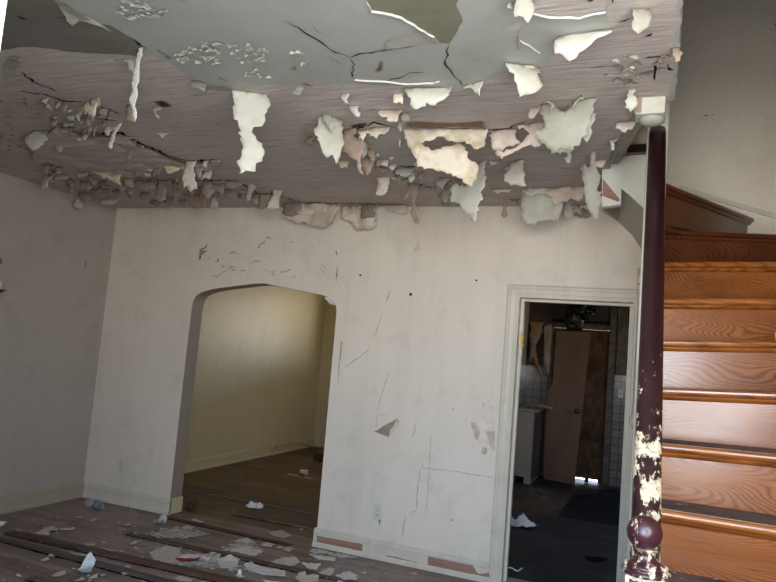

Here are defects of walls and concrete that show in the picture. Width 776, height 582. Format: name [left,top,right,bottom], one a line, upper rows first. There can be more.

crack [289,23,411,78]
crack [443,45,463,86]
crack [19,71,372,204]
flaking render [0,0,683,231]
peeling [374,419,400,437]
crack [401,424,493,539]
peeling [317,536,363,551]
peeling [428,556,489,577]